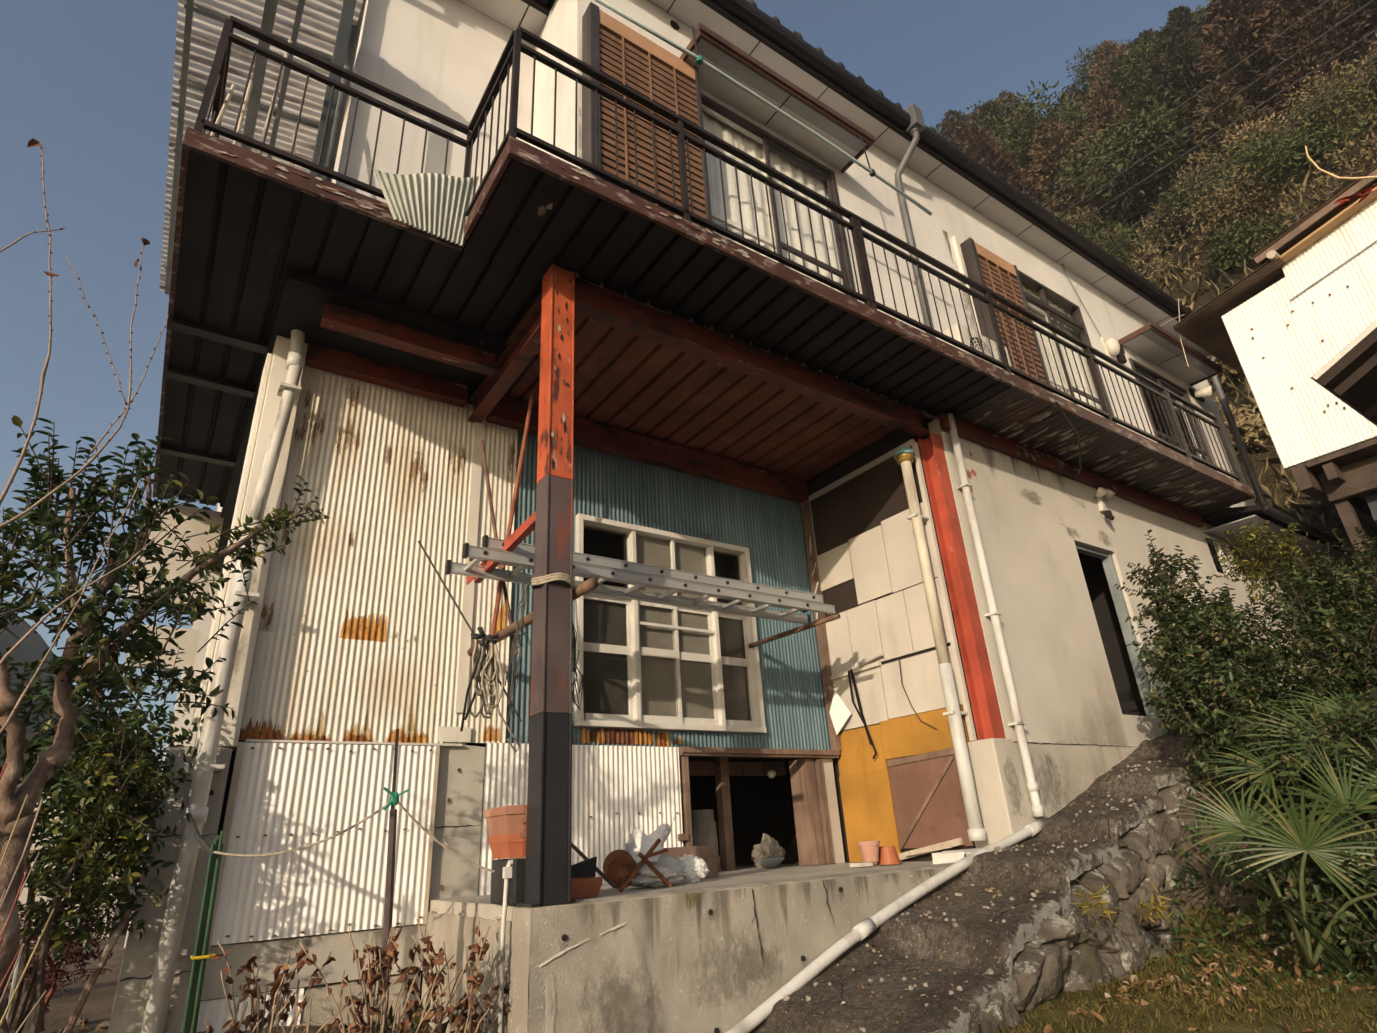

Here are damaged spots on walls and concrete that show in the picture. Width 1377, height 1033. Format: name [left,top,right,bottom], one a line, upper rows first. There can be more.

corrosion [295,385,360,454]
corrosion [410,451,428,492]
corrosion [448,448,466,474]
corrosion [340,610,416,643]
corrosion [239,714,428,743]
crack [751,889,767,982]
water stain [544,980,555,1033]